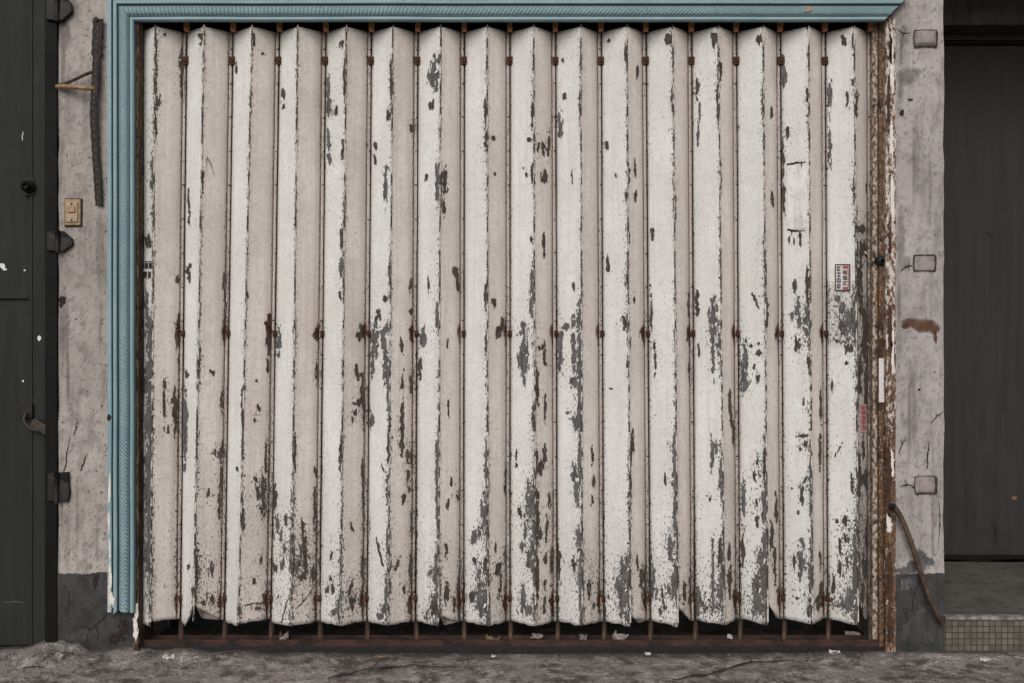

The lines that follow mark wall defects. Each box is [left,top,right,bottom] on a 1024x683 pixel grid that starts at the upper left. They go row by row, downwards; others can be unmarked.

crack [63,423,87,472]
peeling [253,438,318,583]
peeling [351,263,449,538]
peeling [426,424,507,625]
peeling [516,231,596,508]
peeling [517,443,600,622]
peeling [615,432,780,624]
peeling [686,289,762,447]
peeling [790,224,868,409]
peeling [792,515,868,620]
rust [876,304,940,358]
crack [899,411,944,542]